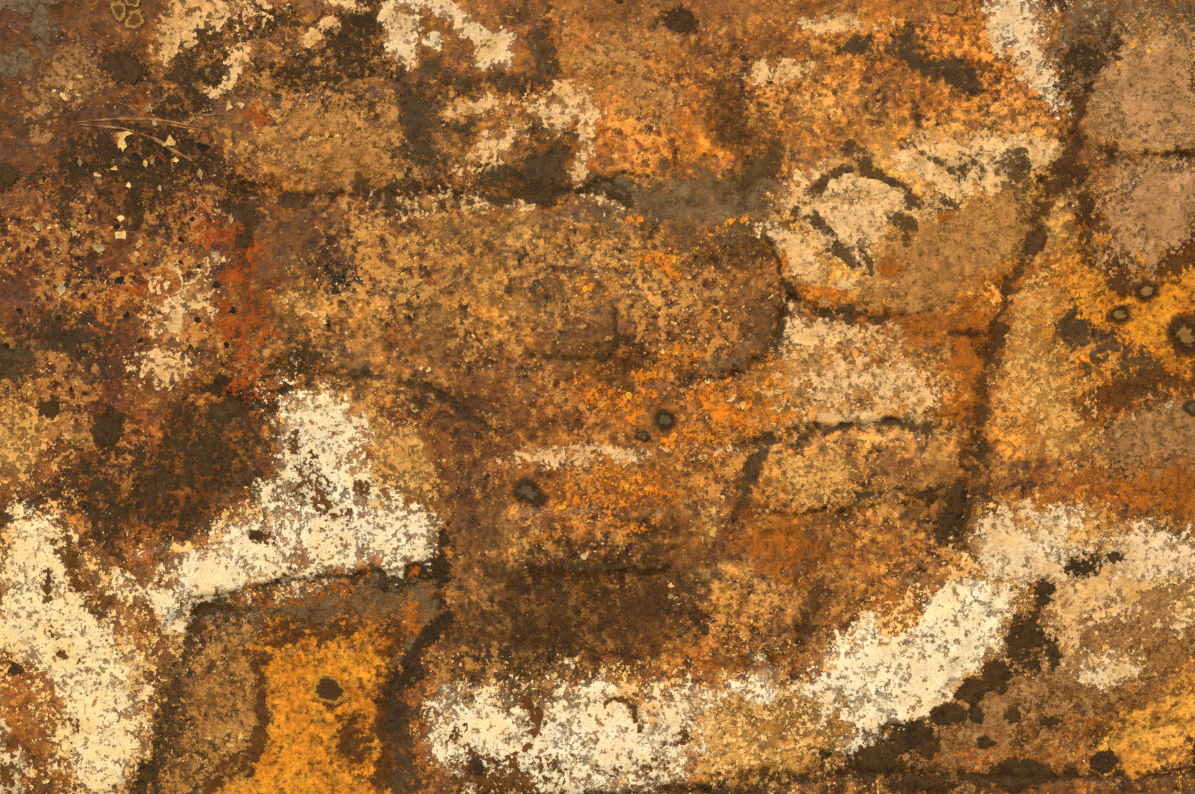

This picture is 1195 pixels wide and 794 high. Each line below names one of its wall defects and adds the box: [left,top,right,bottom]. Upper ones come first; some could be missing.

water stain [164,0,583,205]
water stain [789,139,962,277]
water stain [898,132,1033,183]
rust [771,182,1195,433]
water stain [208,367,291,411]
water stain [0,475,76,528]
rust [277,421,372,536]
crack [125,563,409,794]
rust [185,581,421,794]
rust [445,719,694,794]
crack [523,749,1195,794]
rust [845,549,1125,794]